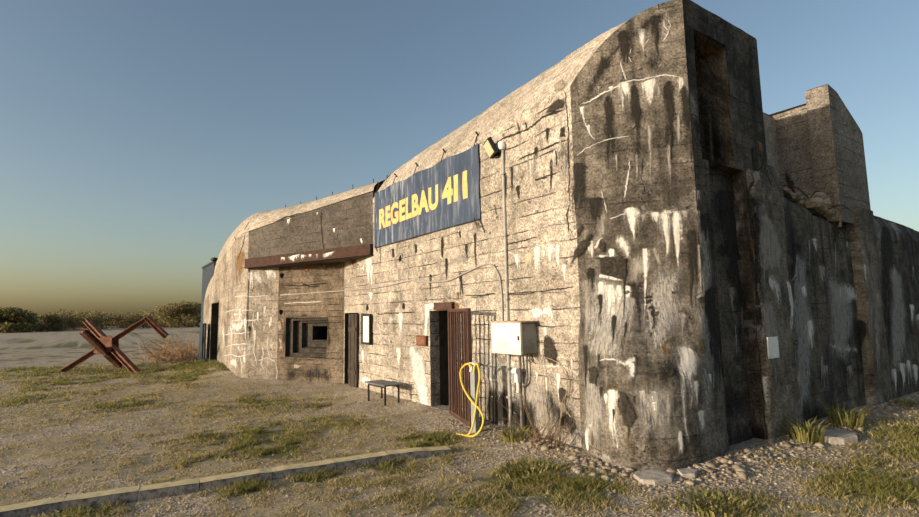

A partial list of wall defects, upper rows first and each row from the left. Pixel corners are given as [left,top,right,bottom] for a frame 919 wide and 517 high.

water stain [517,124,549,182]
crack [497,20,682,231]
water stain [588,15,693,179]
water stain [479,137,828,451]
water stain [819,221,919,388]